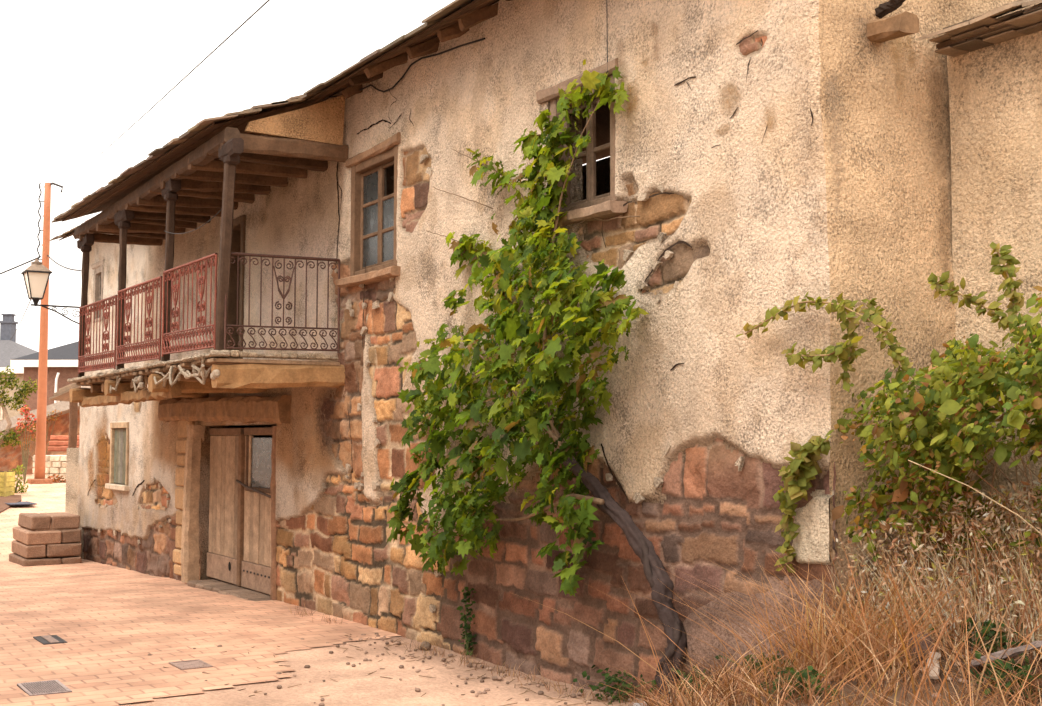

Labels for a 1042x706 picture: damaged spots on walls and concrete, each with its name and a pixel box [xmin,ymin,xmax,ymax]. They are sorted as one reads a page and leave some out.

flaking render [739,35,767,55]
flaking render [400,147,432,233]
flaking render [567,182,710,303]
flaking render [94,433,118,508]
flaking render [83,478,181,581]
flaking render [276,264,838,698]